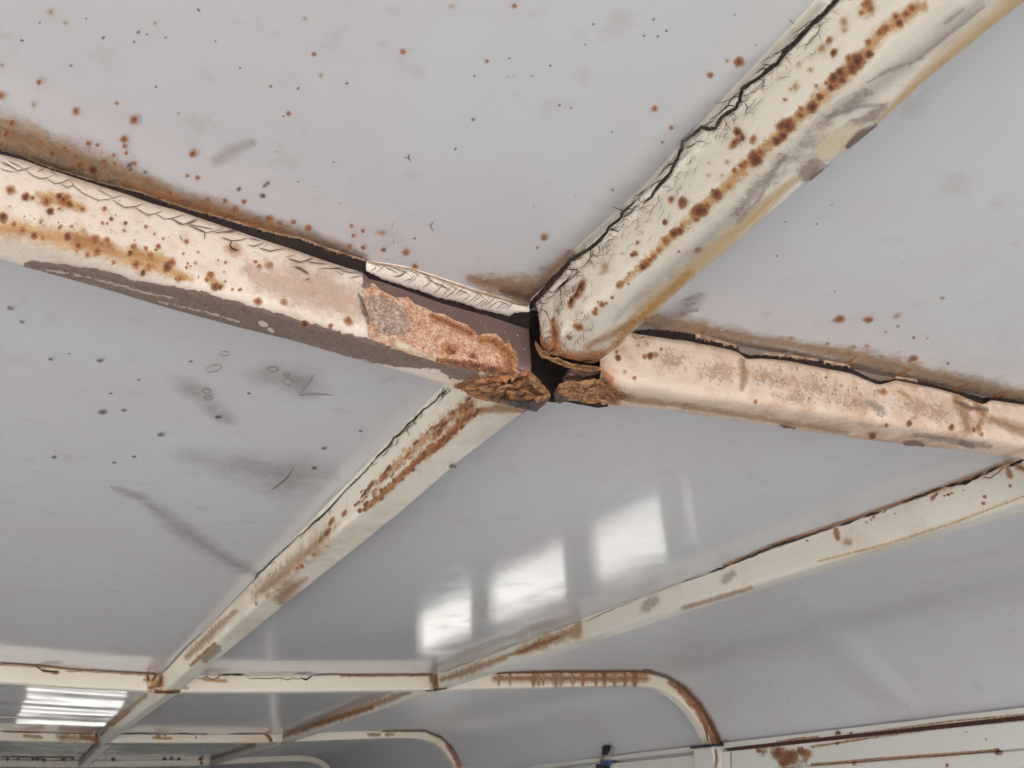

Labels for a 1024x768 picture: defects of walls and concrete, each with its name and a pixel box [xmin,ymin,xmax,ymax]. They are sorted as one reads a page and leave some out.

rust [0,185,242,291]
rust [0,119,366,261]
crack [1,0,851,354]
rust [567,280,585,308]
rust [591,0,927,316]
rust [251,283,551,605]
crack [0,387,450,676]
rust [185,610,237,666]
rust [425,620,732,768]
rust [755,714,1024,768]